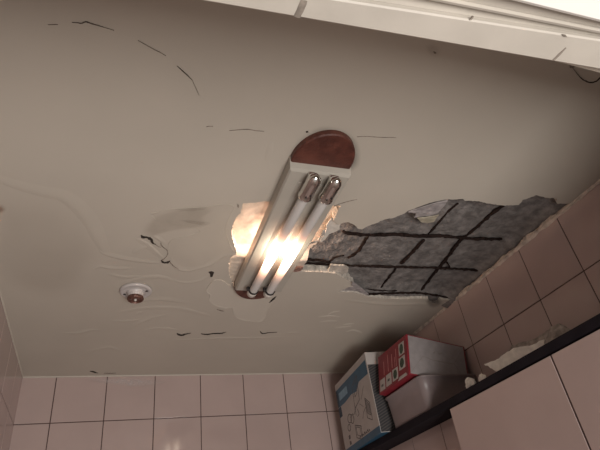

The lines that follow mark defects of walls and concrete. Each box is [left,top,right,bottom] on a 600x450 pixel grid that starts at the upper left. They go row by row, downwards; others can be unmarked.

crack [48,21,114,31]
crack [141,235,178,269]
peeling [206,201,276,322]
spalling [293,195,569,308]